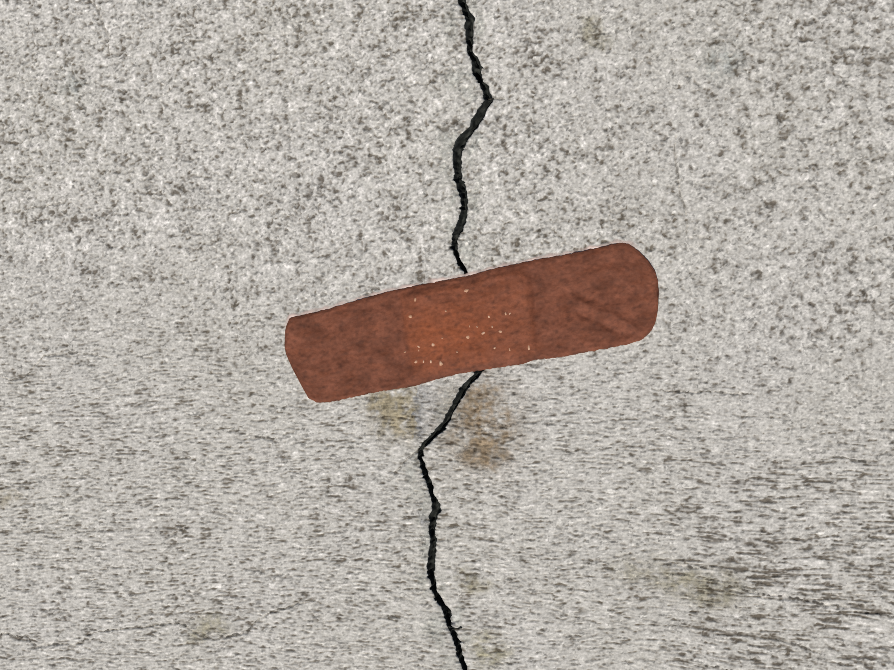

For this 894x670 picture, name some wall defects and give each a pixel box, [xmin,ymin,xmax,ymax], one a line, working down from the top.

crack [439,0,494,275]
crack [403,370,484,670]